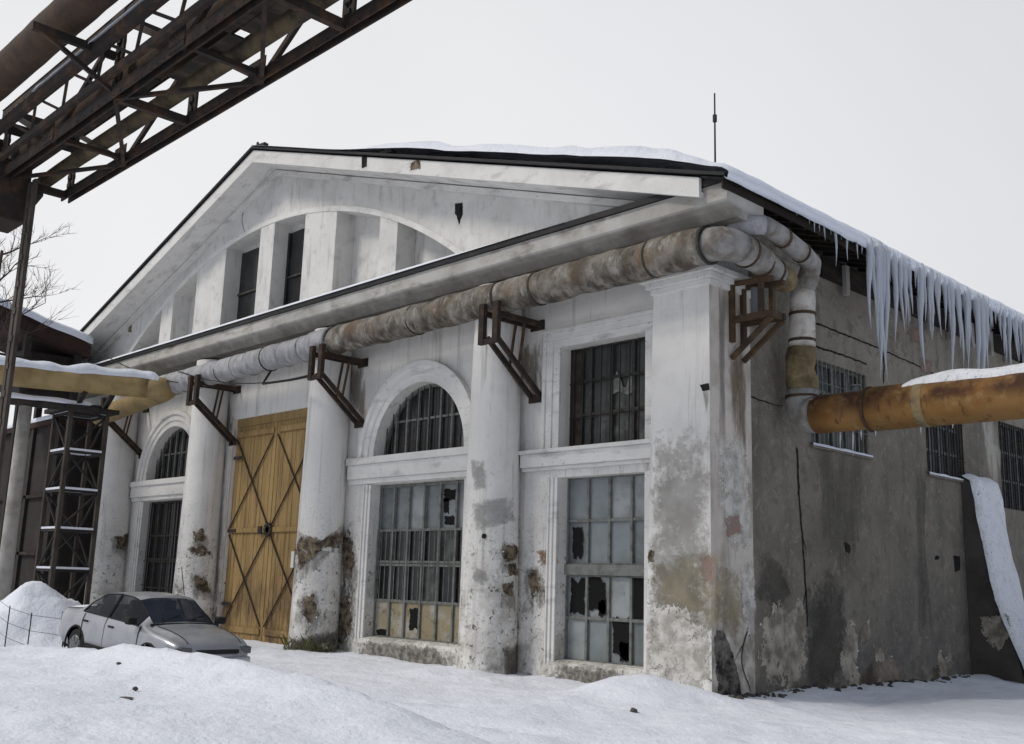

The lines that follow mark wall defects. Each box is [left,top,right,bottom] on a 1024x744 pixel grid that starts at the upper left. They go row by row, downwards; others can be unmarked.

spalling [113,533,129,552]
spalling [187,528,211,557]
spalling [194,575,211,593]
spalling [295,530,455,666]
spalling [500,544,558,599]
peeling [646,433,808,695]
leakage [757,558,789,609]
crack [796,447,808,627]
spalling [839,618,903,686]
spalling [980,614,1011,651]